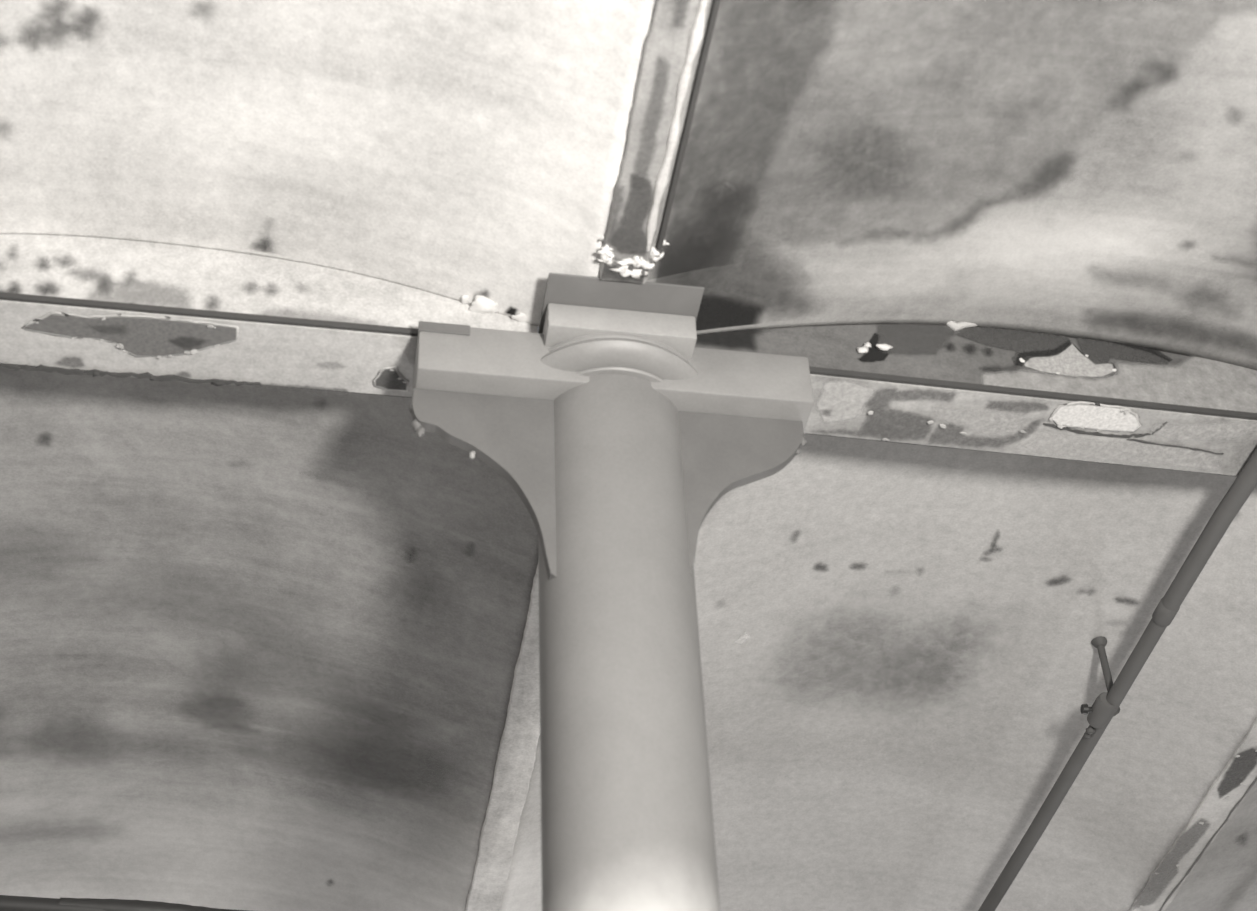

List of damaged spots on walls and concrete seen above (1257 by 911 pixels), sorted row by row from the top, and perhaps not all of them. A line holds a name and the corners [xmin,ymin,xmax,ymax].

leakage [74,13,96,36]
peeling [596,173,670,280]
peeling [57,358,84,368]
peeling [21,312,239,359]
leakage [948,344,1015,373]
peeling [820,323,1257,447]
peeling [1218,748,1257,798]
peeling [1134,820,1209,909]